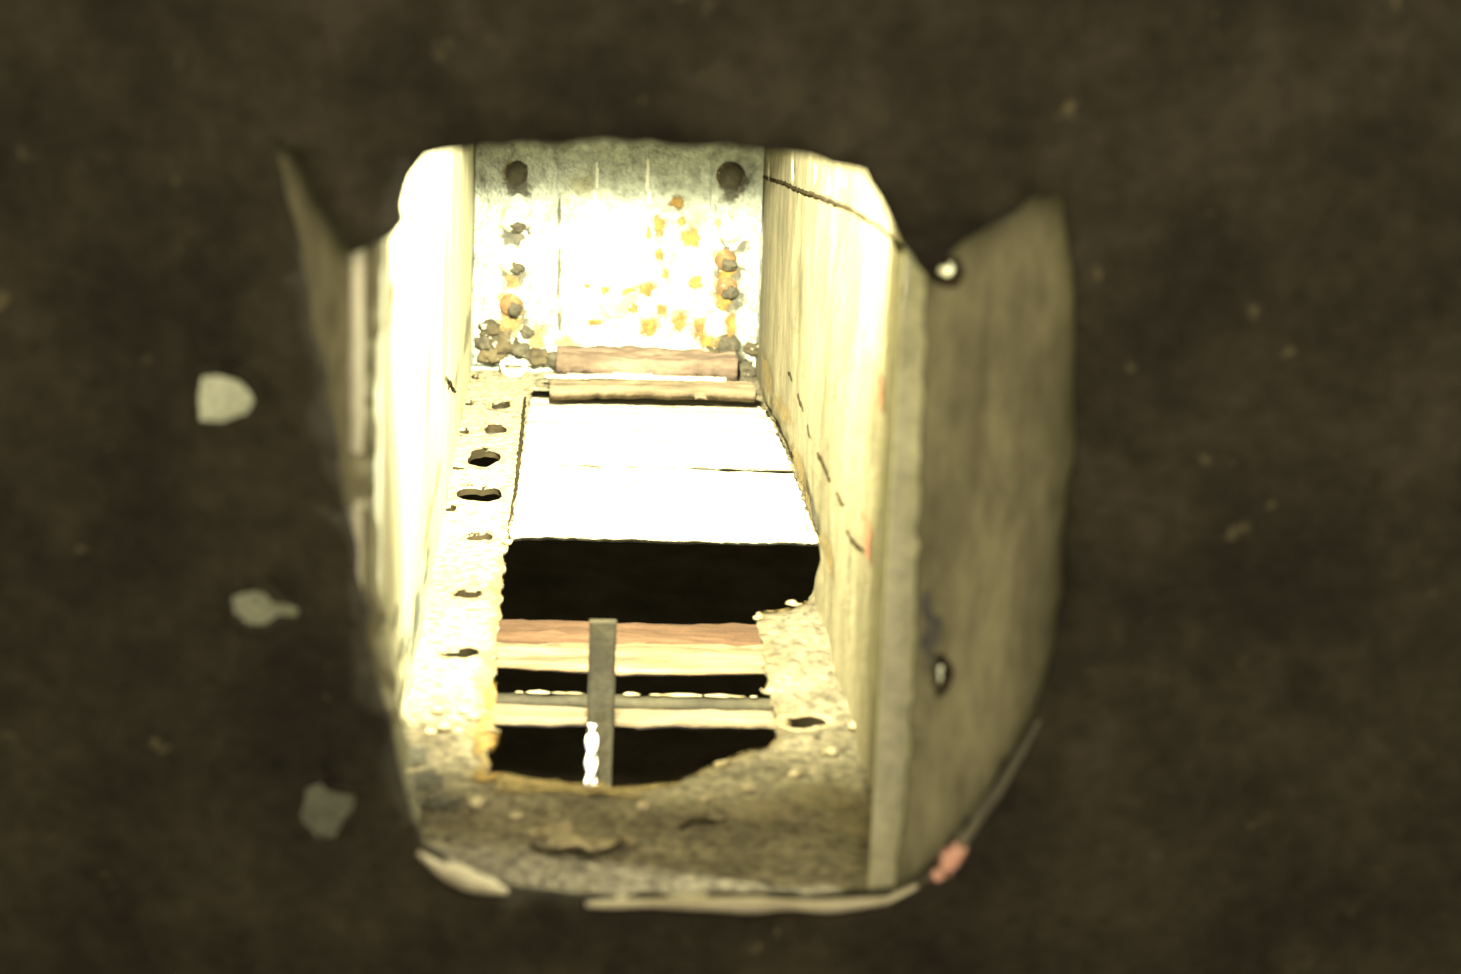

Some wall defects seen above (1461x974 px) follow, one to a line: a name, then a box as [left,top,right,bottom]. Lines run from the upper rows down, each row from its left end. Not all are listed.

corrosion [501,210,526,233]
corrosion [474,262,582,368]
corrosion [584,196,790,425]
corrosion [792,450,833,579]